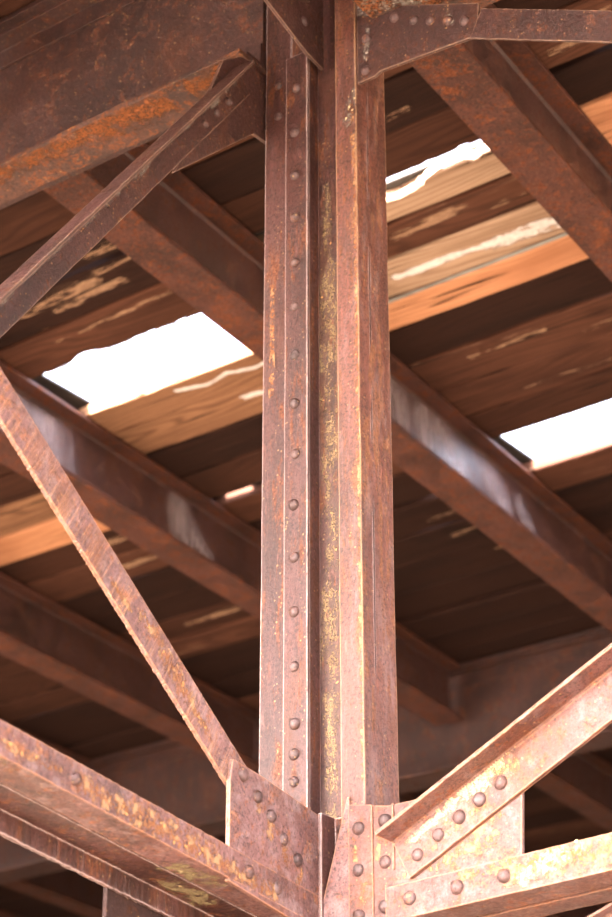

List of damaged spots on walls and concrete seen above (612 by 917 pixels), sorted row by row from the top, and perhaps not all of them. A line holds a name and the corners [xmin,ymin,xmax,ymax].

corrosion [0,65,218,183]